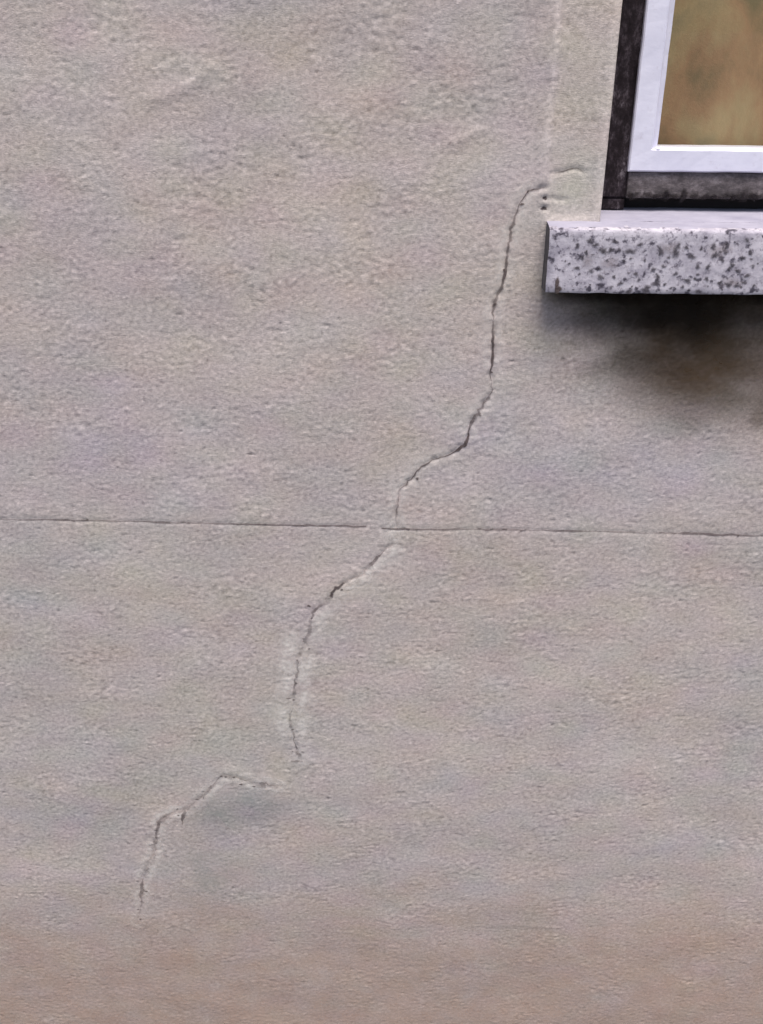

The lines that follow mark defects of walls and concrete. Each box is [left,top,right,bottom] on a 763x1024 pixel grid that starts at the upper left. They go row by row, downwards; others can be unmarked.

crack [490,189,536,379]
crack [398,414,476,501]
crack [29,516,92,524]
crack [219,523,583,532]
crack [681,530,763,538]
crack [308,583,344,619]